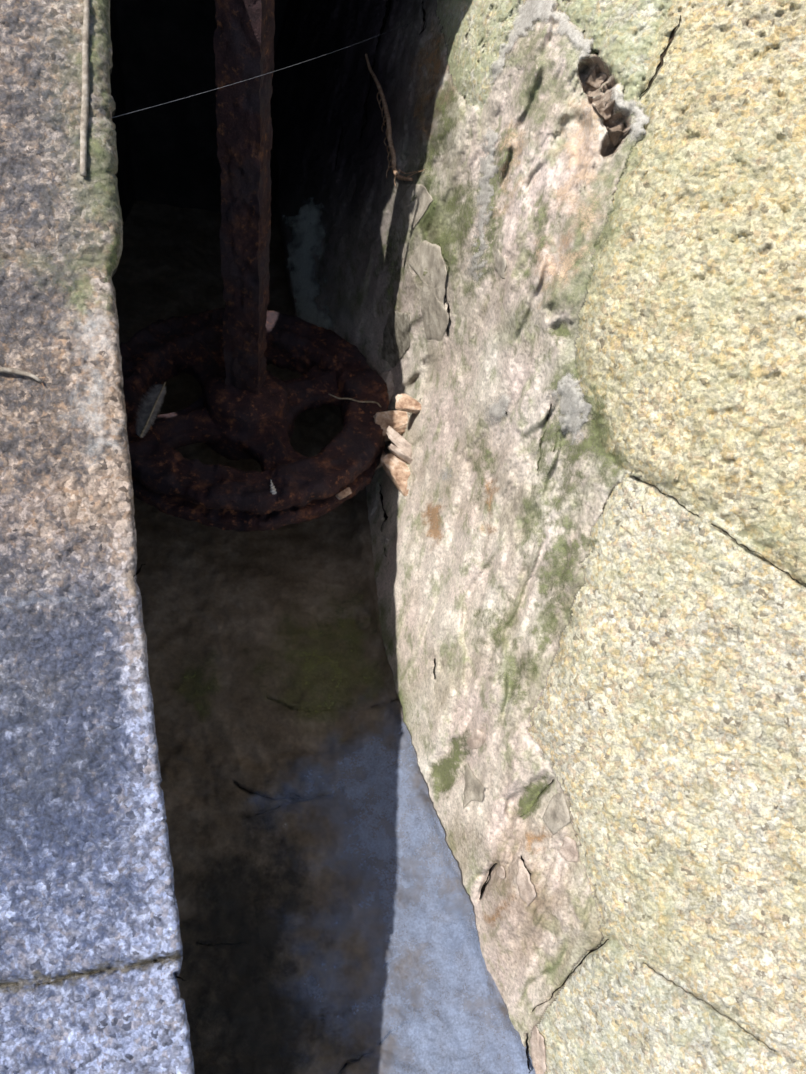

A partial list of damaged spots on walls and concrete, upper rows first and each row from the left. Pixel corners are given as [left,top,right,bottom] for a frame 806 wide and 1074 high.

spalling [578,54,632,158]
crack [629,476,806,585]
crack [0,942,214,986]
crack [642,962,775,1053]